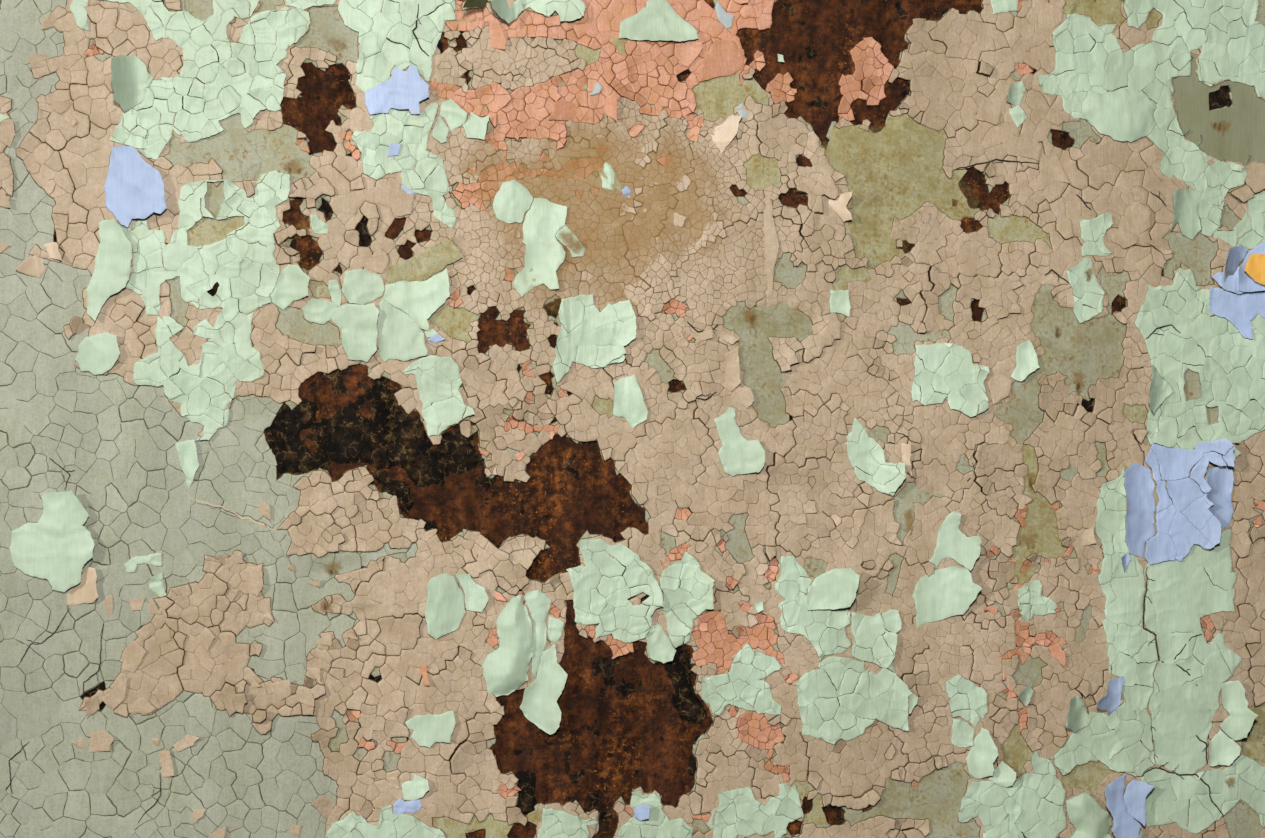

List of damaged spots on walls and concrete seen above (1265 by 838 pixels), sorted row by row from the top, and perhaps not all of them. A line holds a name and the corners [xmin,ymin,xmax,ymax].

corrosion [280,63,356,155]
crack [412,4,429,57]
corrosion [736,0,983,150]
crack [0,0,417,838]
corrosion [264,364,648,583]
spalling [519,0,1265,838]
peeling [10,490,113,615]
peeling [425,573,489,639]
crack [1143,567,1202,686]
peeling [328,710,456,772]
corrosion [490,600,713,838]
crack [1123,702,1223,816]